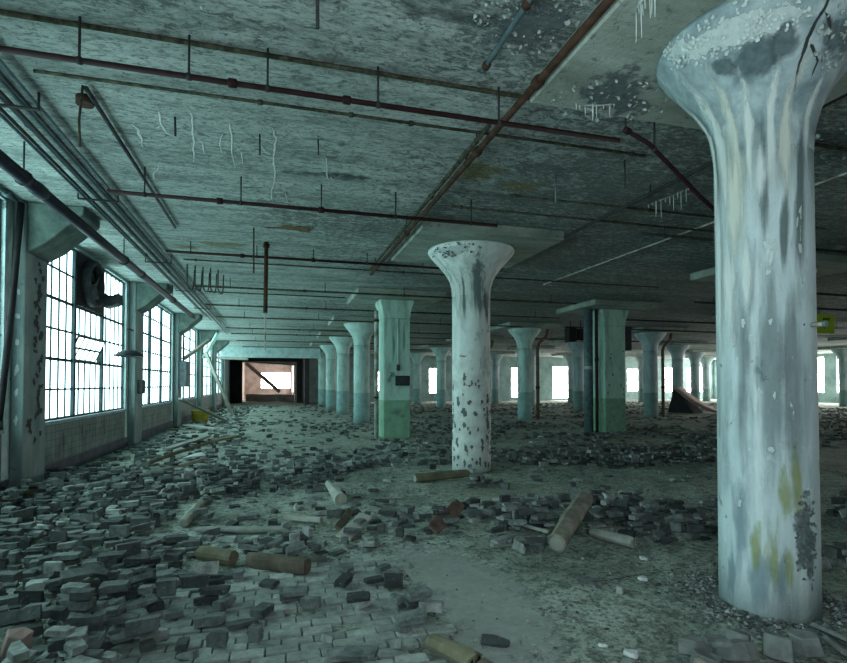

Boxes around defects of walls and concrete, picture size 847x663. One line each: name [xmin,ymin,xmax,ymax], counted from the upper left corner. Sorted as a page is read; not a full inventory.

peeling [470,0,583,58]
damp [635,0,656,38]
peeling [662,0,812,76]
crack [795,0,831,88]
peeling [813,2,847,72]
peeling [550,64,674,122]
damp [689,68,823,336]
spalling [452,346,491,468]
spalling [794,490,817,590]